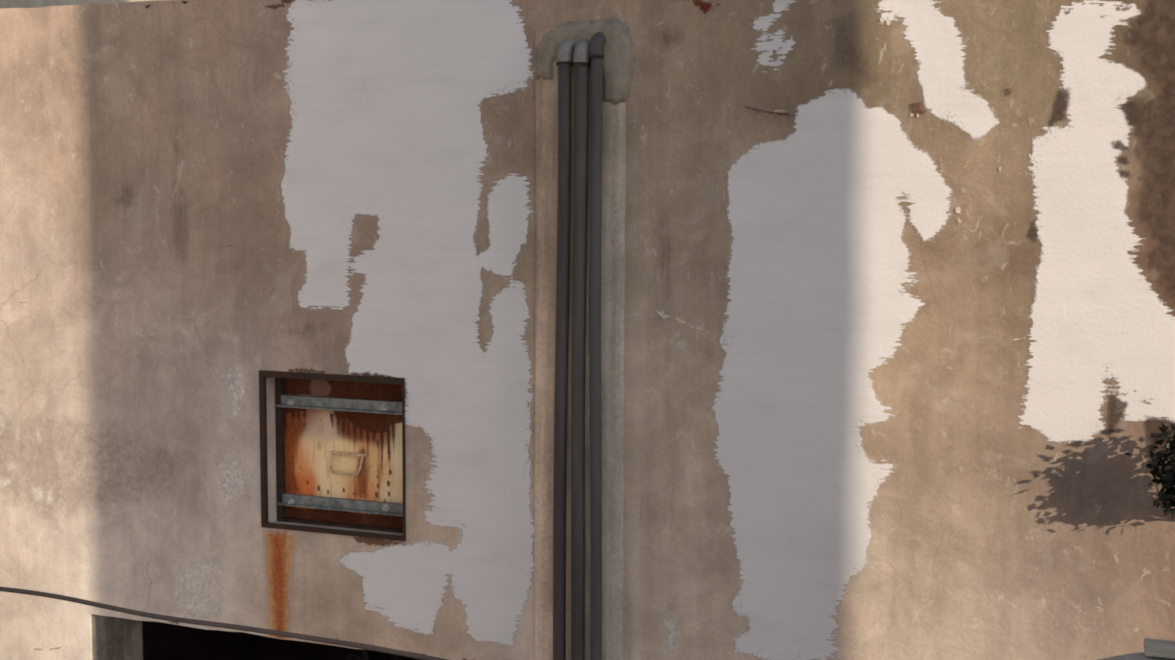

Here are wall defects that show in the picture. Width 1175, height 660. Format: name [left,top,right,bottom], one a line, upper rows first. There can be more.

spalling [910,102,926,117]
rust [284,378,403,529]
rust [267,533,294,639]
spalling [354,537,402,546]